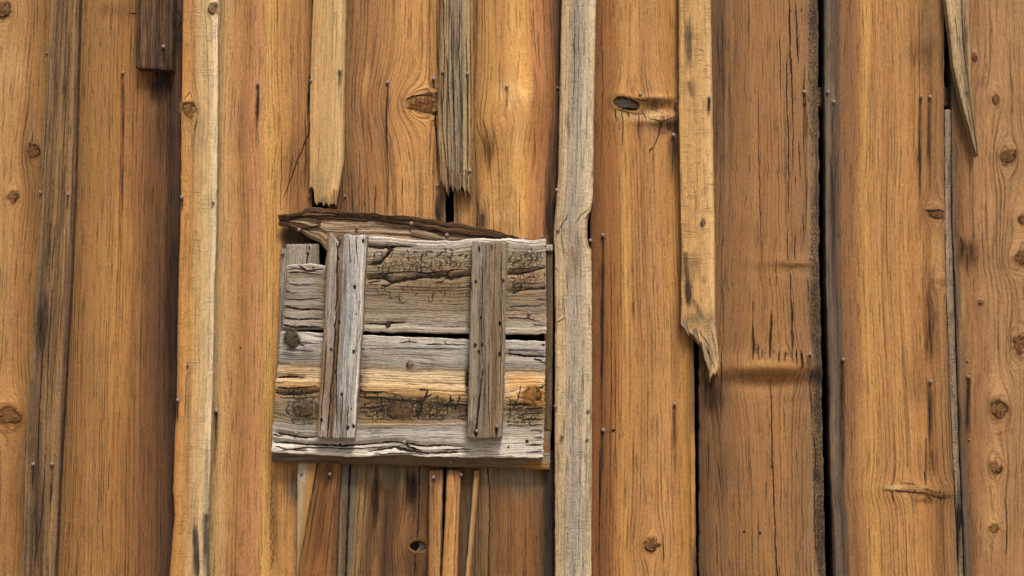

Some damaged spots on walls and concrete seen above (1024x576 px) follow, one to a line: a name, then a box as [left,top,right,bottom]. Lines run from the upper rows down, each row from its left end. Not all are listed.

crack [274,75,565,576]